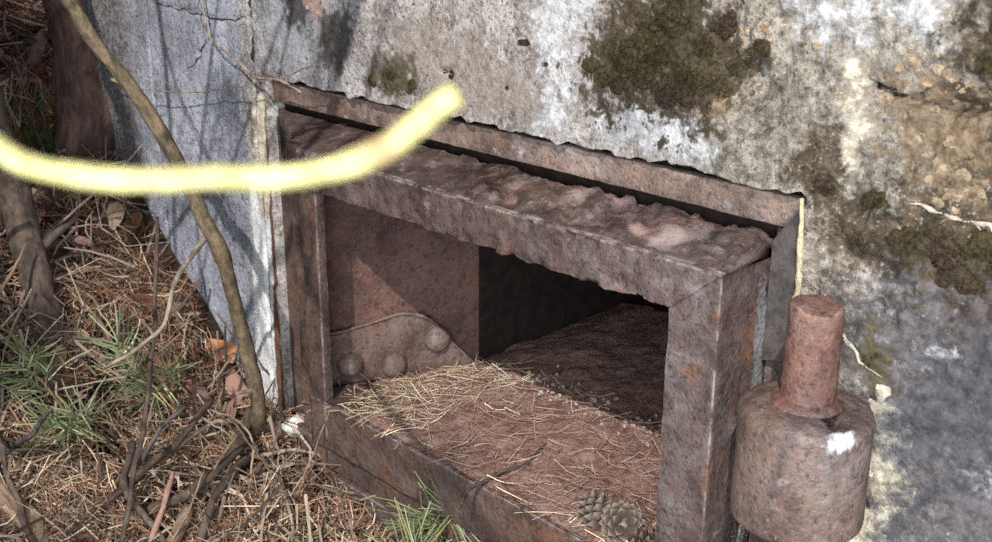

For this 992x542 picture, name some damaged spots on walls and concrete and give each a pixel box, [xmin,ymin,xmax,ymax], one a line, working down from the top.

damp [385,0,719,168]
rust [710,97,728,117]
crack [910,203,992,231]